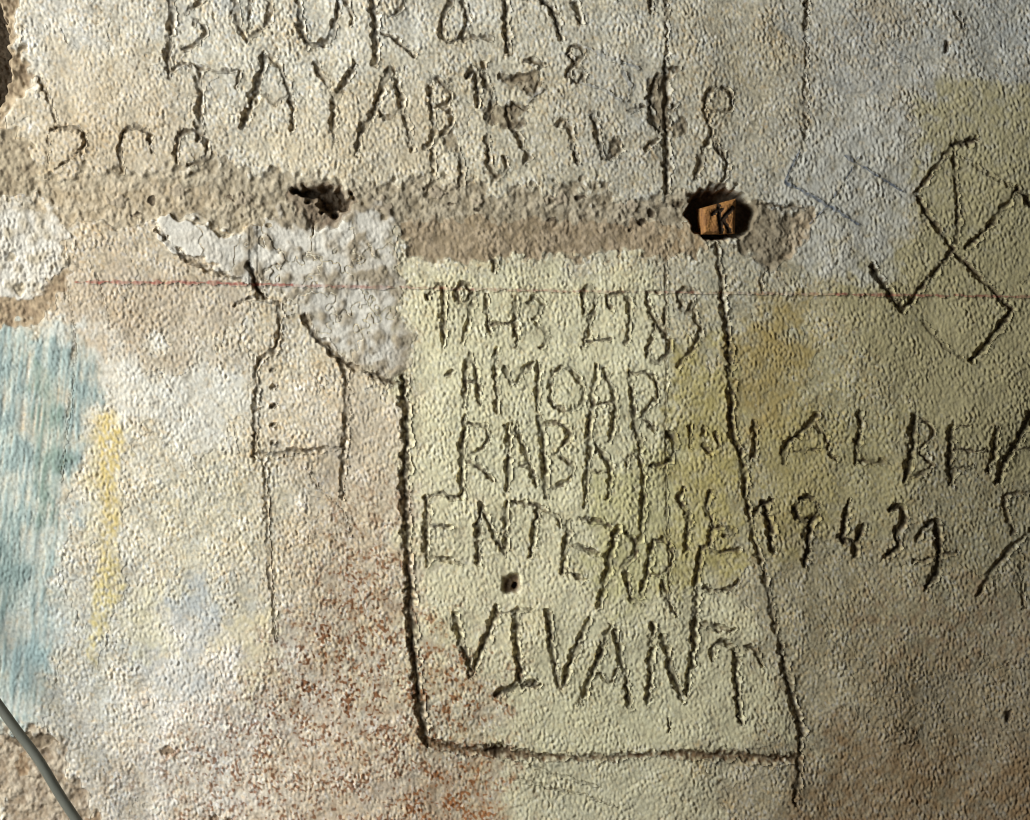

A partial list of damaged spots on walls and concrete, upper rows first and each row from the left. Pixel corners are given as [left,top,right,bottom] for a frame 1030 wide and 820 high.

flaking render [0,0,817,389]